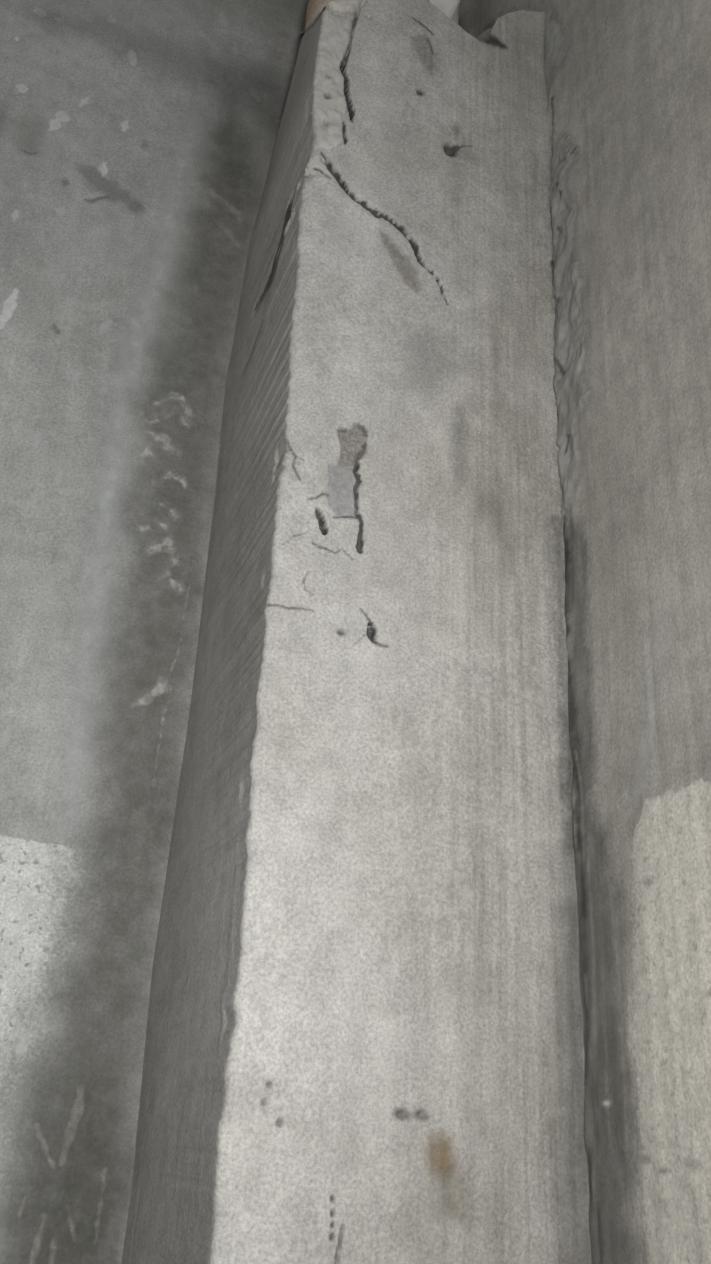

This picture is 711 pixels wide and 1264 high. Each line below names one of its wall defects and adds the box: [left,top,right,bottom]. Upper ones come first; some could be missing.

crack [243,15,442,375]
damp [126,447,200,813]
damp [139,367,209,457]
peeling [312,426,367,554]